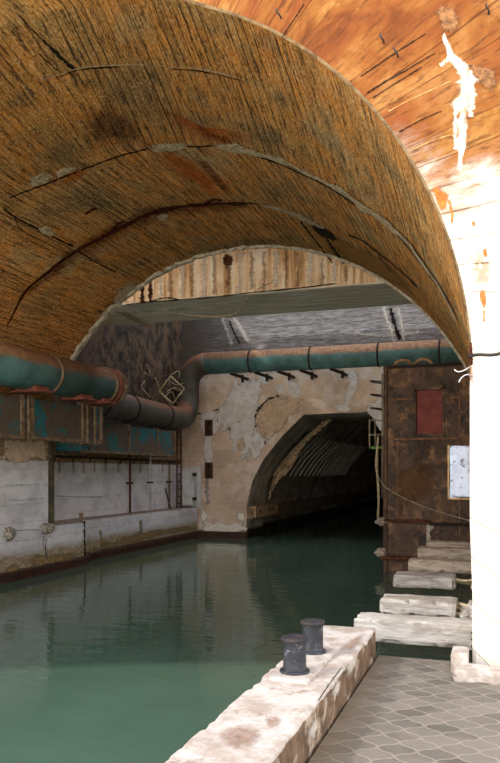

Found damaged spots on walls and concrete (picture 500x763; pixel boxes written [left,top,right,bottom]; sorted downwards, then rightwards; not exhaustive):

crack [18,15,243,82]
crack [81,148,148,171]
corrosion [433,187,454,223]
crack [3,198,257,326]
corrosion [139,278,171,304]
corrosion [202,253,242,297]
crack [300,221,344,264]
crack [349,235,417,287]
peeling [197,372,301,462]
leakage [30,553,76,567]